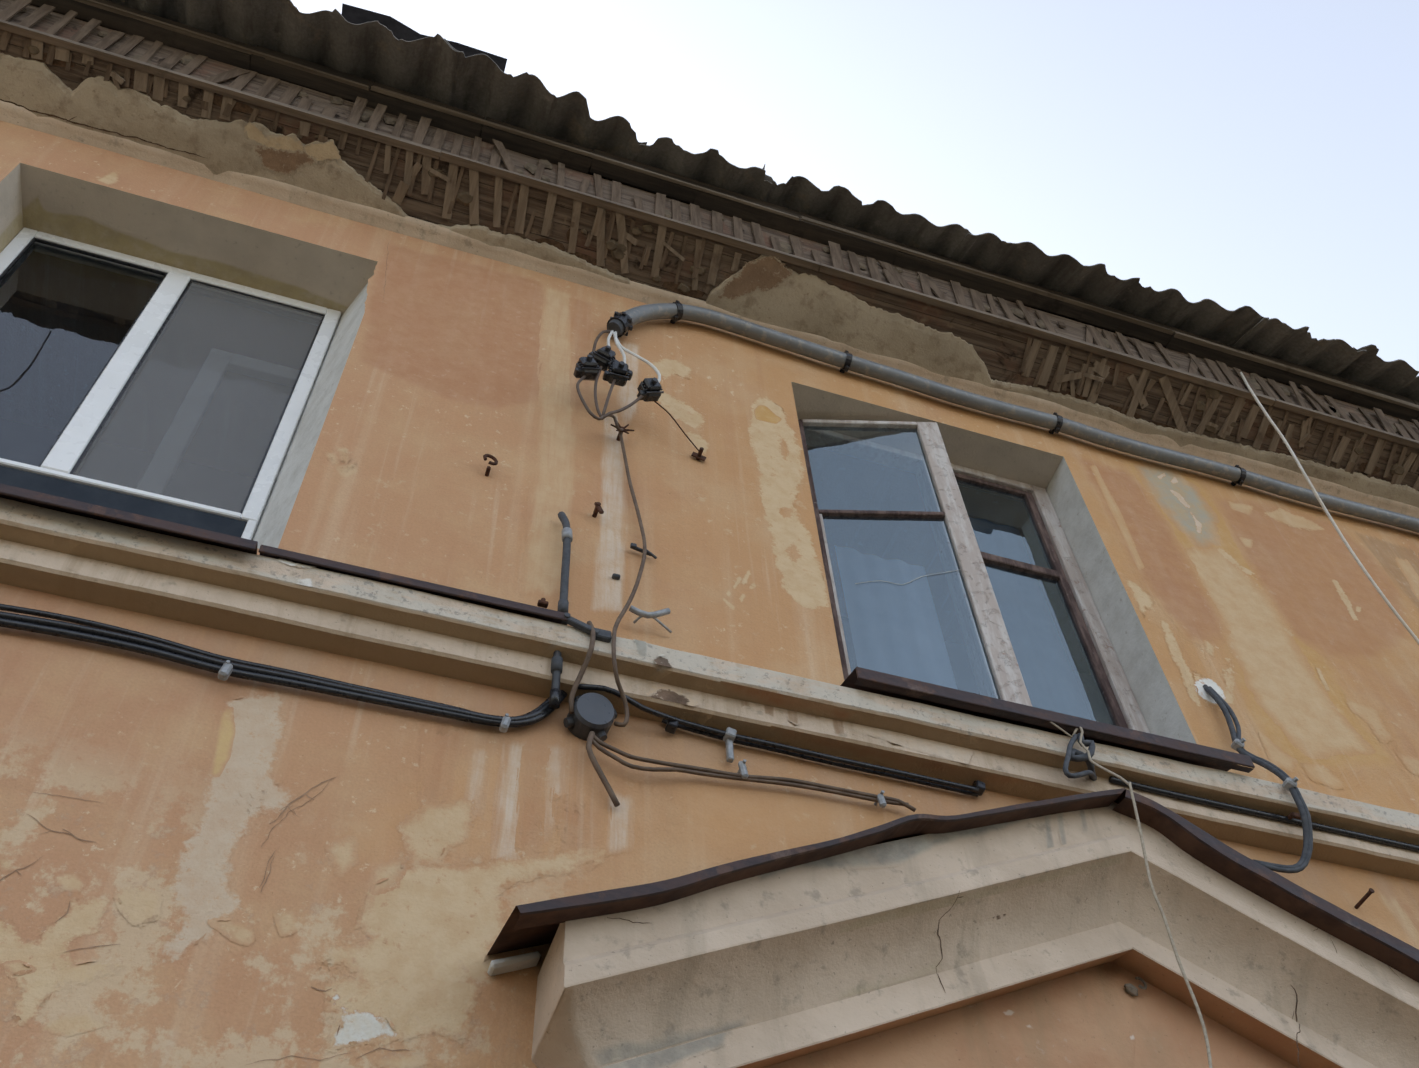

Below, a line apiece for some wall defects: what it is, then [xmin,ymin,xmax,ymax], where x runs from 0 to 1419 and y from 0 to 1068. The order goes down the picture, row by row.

spalling [0,30,794,301]
peeling [747,395,830,611]
peeling [0,897,125,1027]
peeling [147,690,299,966]
crack [259,777,336,892]
peeling [316,798,610,1068]
crack [936,891,964,991]